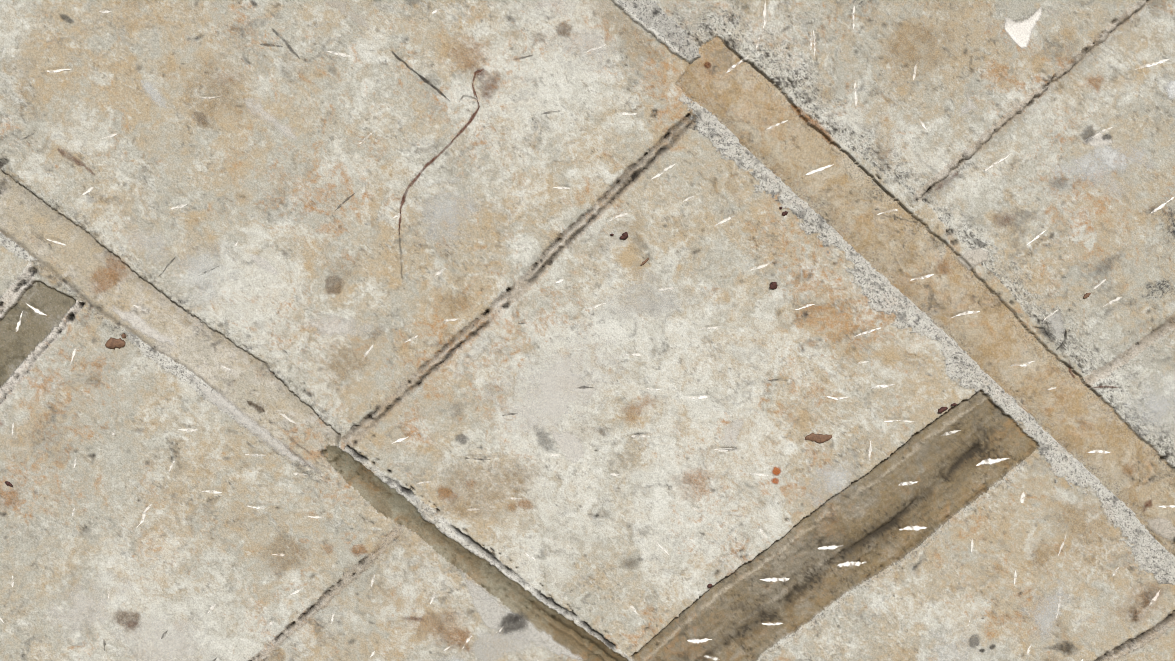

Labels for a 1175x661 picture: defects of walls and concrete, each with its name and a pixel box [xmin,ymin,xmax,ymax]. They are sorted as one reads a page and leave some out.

spalling [1005,7,1049,48]
crack [392,52,482,234]